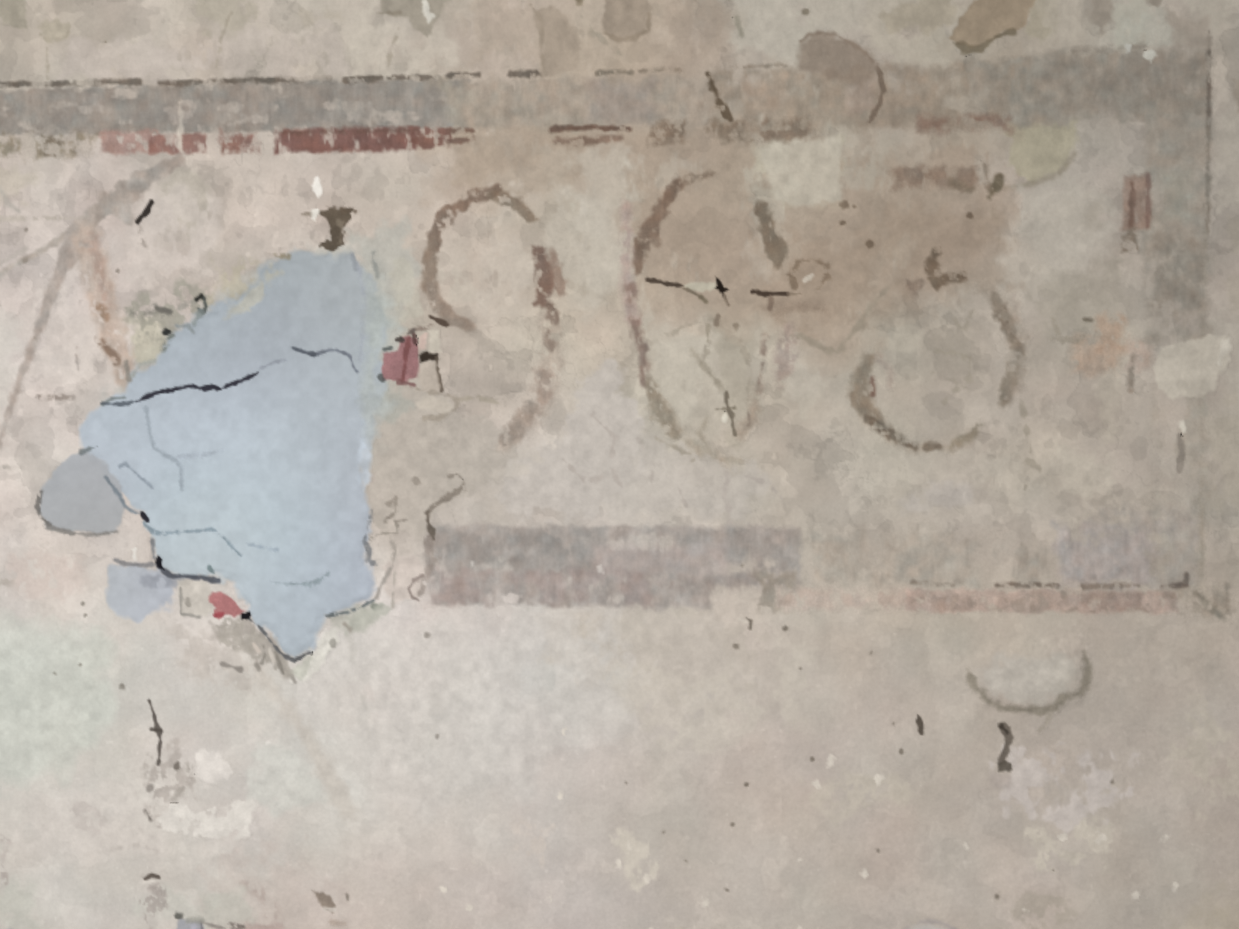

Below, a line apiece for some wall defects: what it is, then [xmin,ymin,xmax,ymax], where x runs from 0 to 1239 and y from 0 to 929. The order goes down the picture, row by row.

peeling [793,7,883,91]
peeling [877,0,1039,57]
spalling [33,245,426,685]
crack [99,346,360,590]
crack [239,610,312,664]
crack [142,697,195,823]